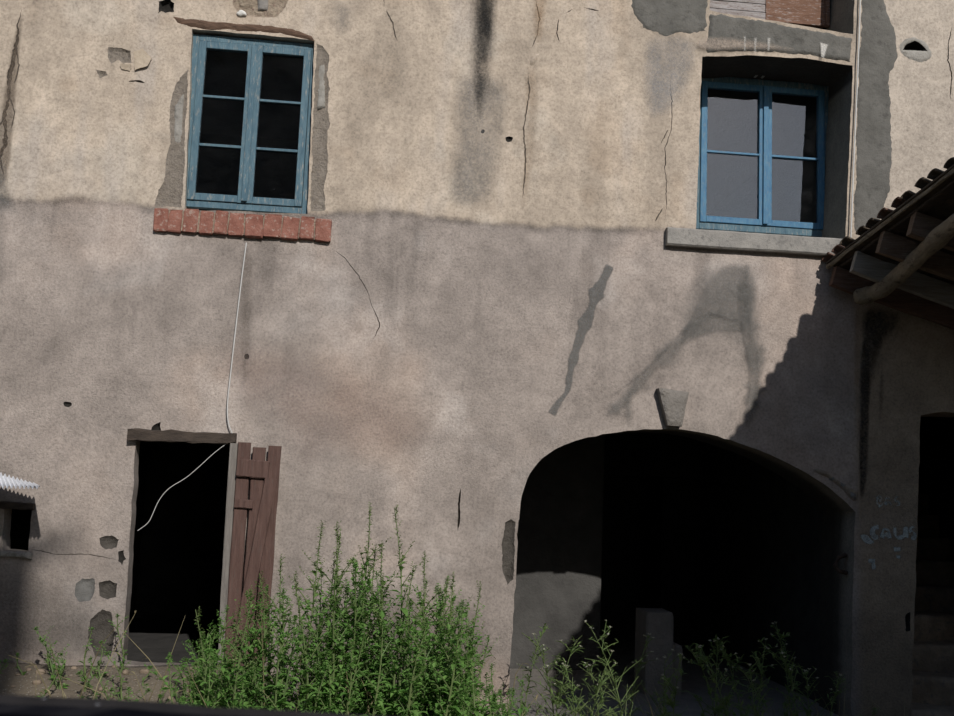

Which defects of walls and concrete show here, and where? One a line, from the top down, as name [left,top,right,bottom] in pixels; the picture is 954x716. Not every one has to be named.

crack [0,10,22,181]
spalling [95,47,152,78]
spalling [233,0,288,18]
water stain [469,0,493,101]
crack [522,73,530,194]
crack [533,3,599,45]
spalling [99,535,126,564]
spalling [75,578,117,657]